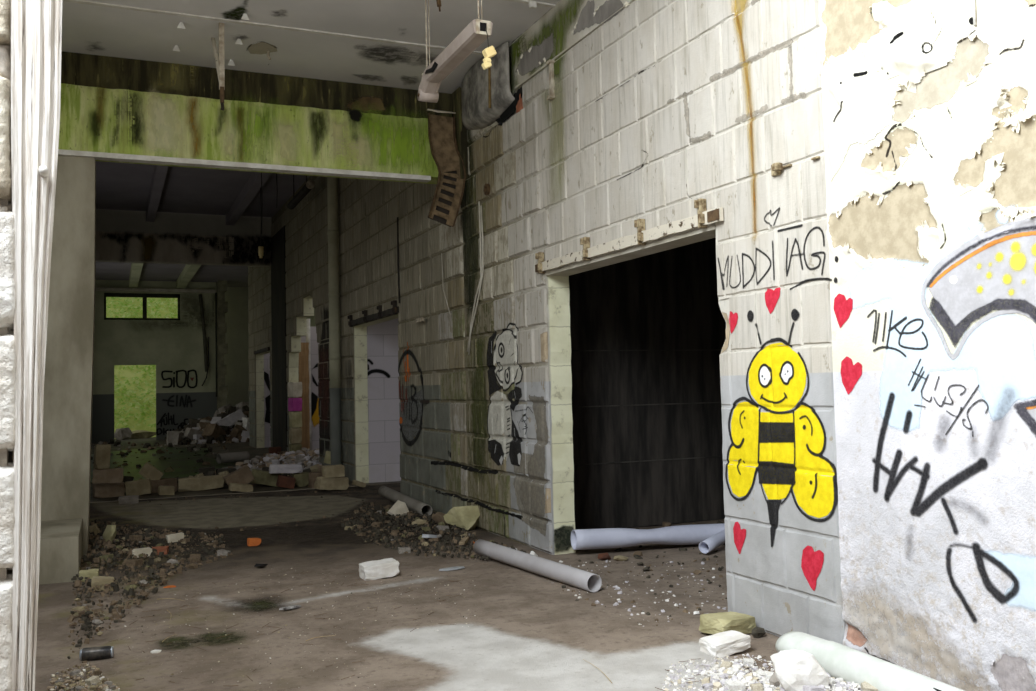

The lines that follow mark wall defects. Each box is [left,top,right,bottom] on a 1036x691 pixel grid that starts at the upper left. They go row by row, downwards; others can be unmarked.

peeling [248,42,277,54]
water stain [311,112,326,151]
water stain [366,48,436,64]
peeling [496,33,554,126]
peeling [572,0,630,34]
rust [734,0,756,232]
peeling [821,0,911,66]
peeling [828,33,992,268]
peeling [953,86,1036,232]
crack [431,450,523,536]